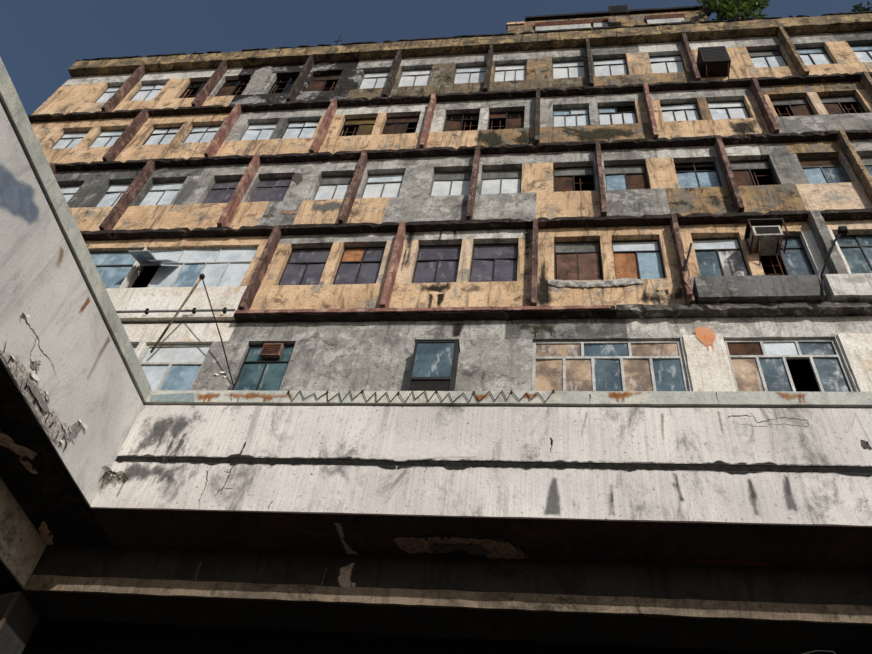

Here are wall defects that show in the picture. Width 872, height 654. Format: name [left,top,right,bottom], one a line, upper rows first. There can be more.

damp [0,165,39,222]
damp [422,284,450,308]
crack [24,317,56,375]
spalling [0,343,88,451]
rust [230,393,291,402]
spalling [0,430,38,474]
damp [117,416,255,494]
crack [199,442,246,505]
damp [686,460,872,514]
spalling [390,536,534,559]